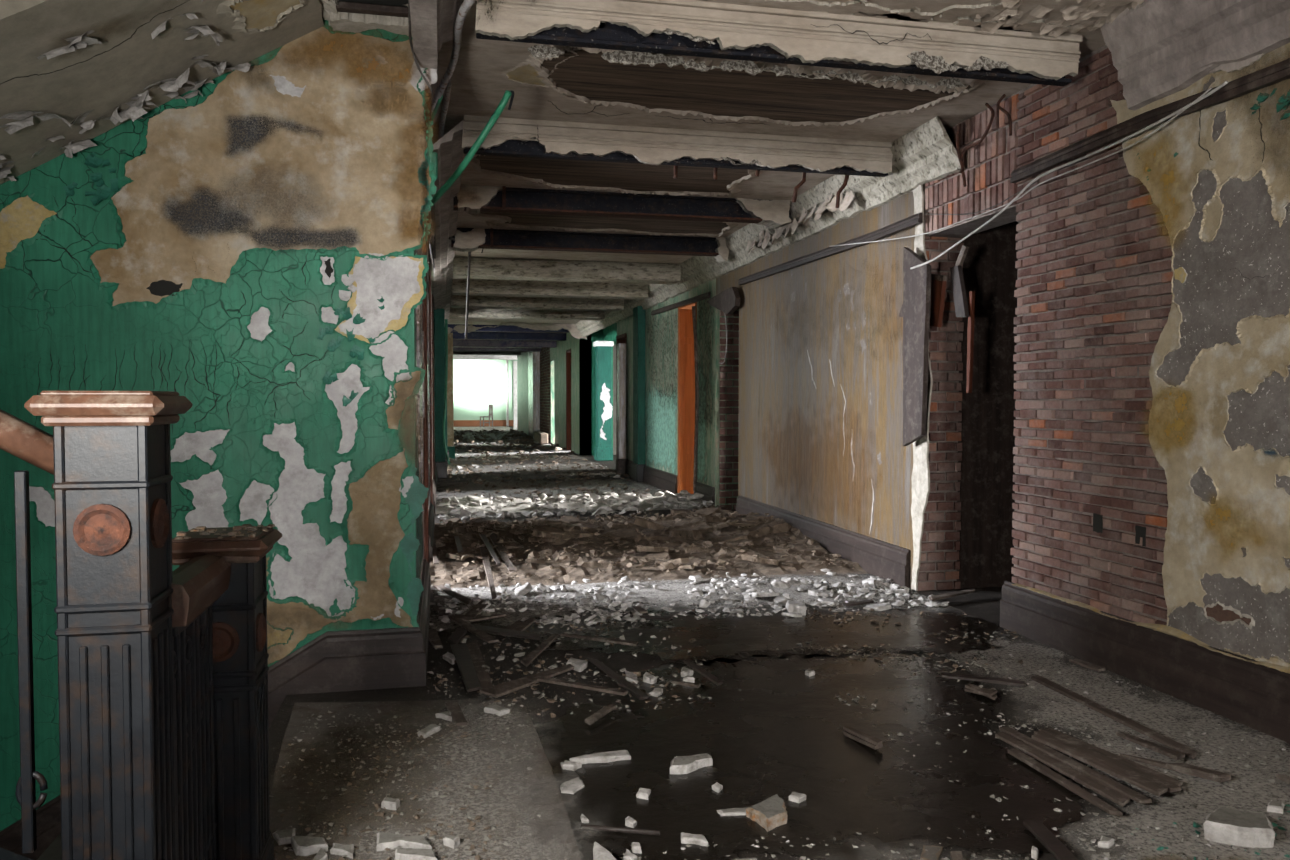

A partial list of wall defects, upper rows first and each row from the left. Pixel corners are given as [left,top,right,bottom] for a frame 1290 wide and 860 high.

peeling [693,0,1145,37]
flaking render [601,50,1010,89]
water stain [227,116,319,155]
crack [36,195,113,276]
water stain [166,179,357,251]
peeling [746,191,854,255]
crack [35,253,335,432]
peeling [0,0,437,667]
flaking render [911,48,1290,674]
water stain [829,359,855,480]